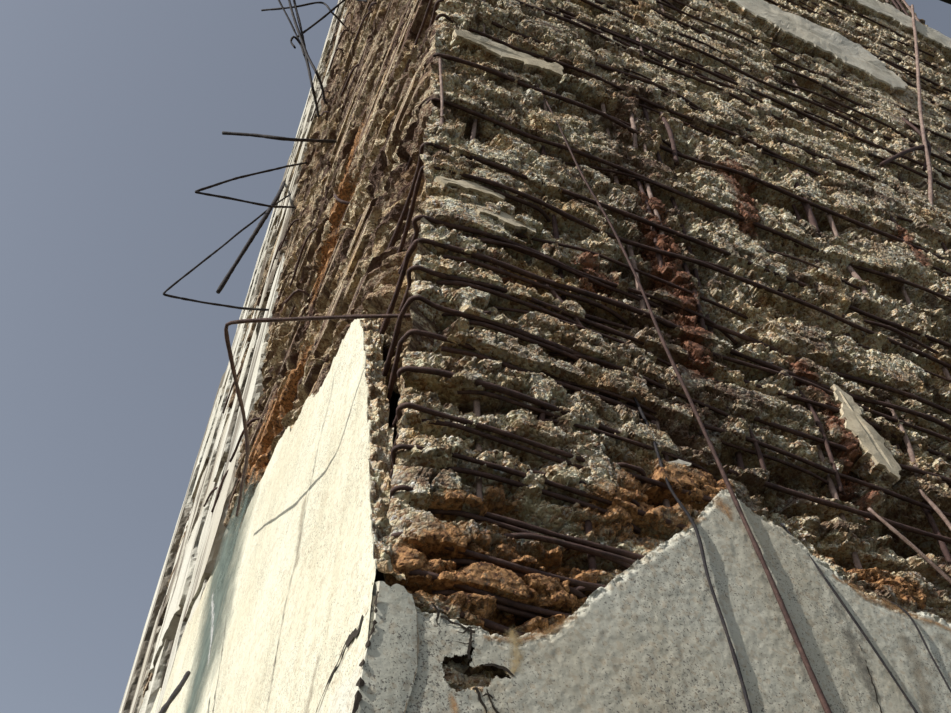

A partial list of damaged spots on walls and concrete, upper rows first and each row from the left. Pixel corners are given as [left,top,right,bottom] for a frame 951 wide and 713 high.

corrosion [310,122,366,303]
spalling [239,0,951,626]
corrosion [638,191,716,381]
corrosion [716,157,766,239]
peeling [119,319,355,713]
corrosion [241,345,313,508]
crack [404,603,513,713]
spalling [442,654,502,692]
corrosion [385,483,605,673]
corrosion [829,558,951,631]